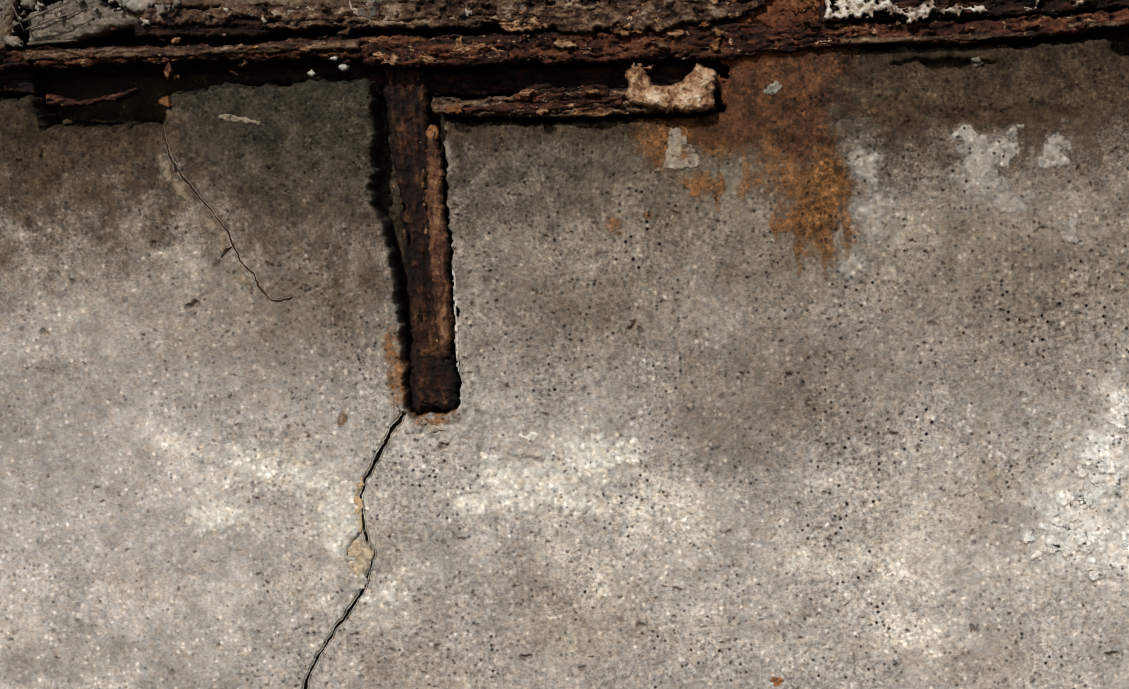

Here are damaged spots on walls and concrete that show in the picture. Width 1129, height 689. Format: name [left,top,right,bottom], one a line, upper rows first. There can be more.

peeling [764,81,783,96]
damp [822,0,988,24]
crack [159,124,292,303]
corrosion [21,0,1129,425]
crack [303,413,405,689]